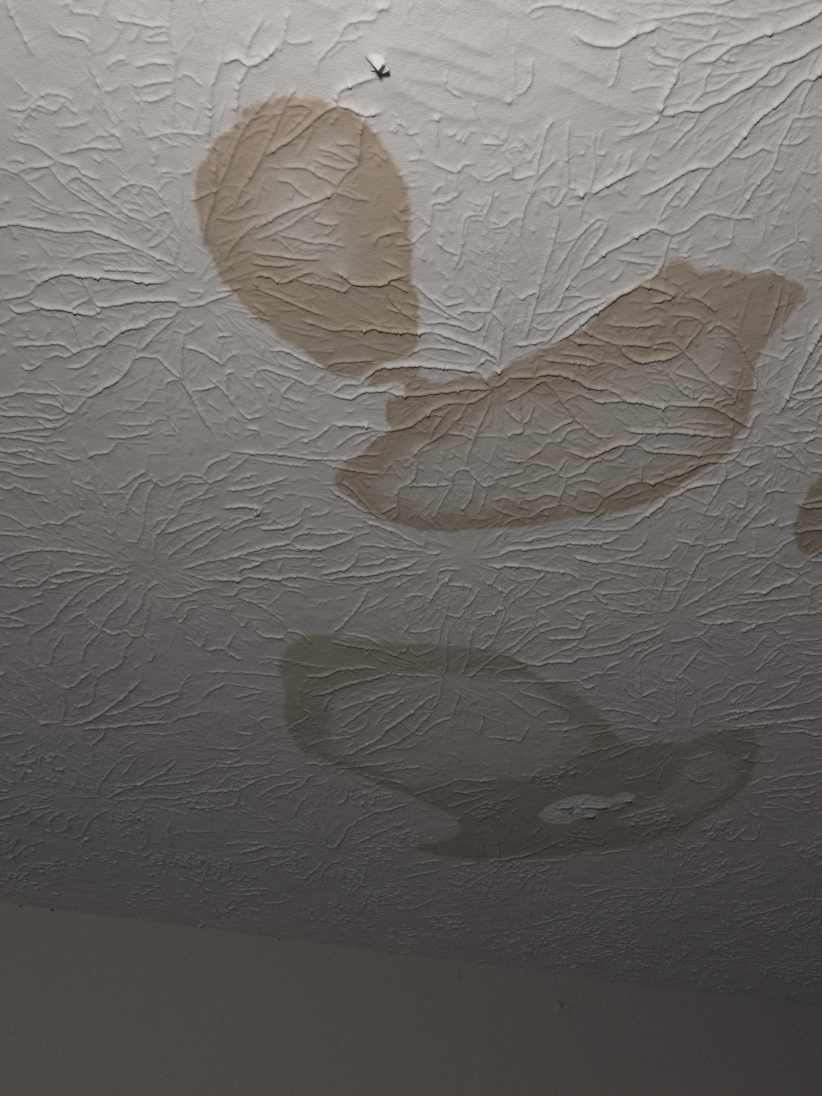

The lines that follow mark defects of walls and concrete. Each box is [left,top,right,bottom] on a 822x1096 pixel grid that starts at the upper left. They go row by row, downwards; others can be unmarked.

water stain [194,96,805,532]
water stain [793,477,822,554]
water stain [278,634,759,863]